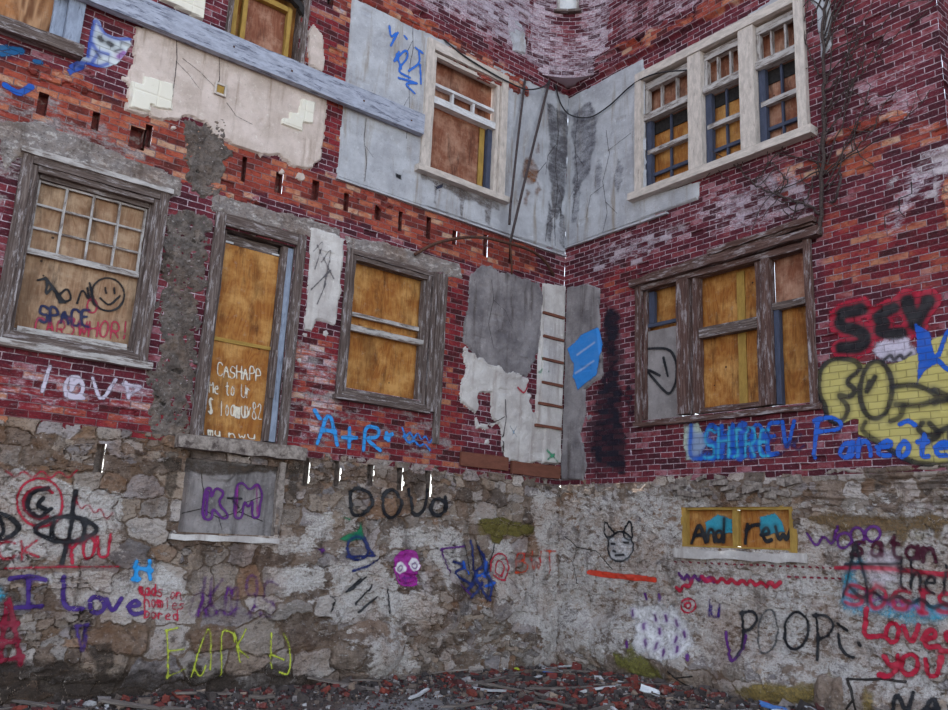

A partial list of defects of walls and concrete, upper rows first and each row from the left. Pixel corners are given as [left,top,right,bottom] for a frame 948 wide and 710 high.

flaking render [121,24,327,205]
water stain [546,103,596,239]
spalling [145,203,213,437]
flaking render [459,265,544,463]
flaking render [556,284,604,481]